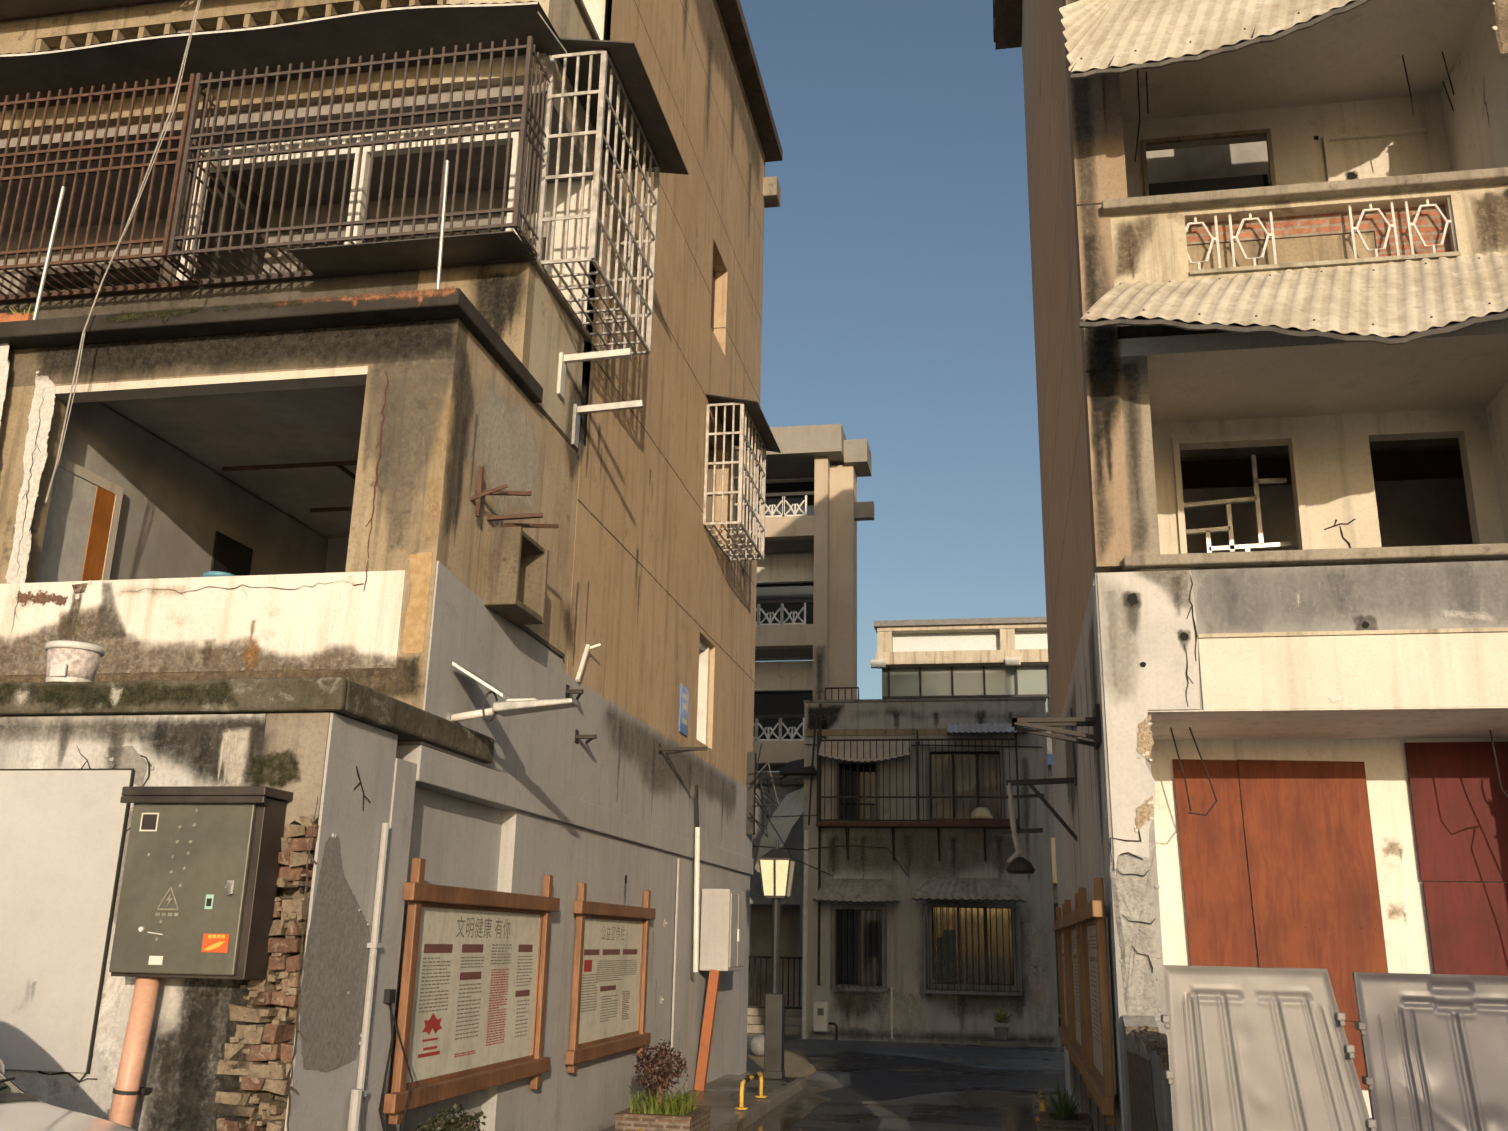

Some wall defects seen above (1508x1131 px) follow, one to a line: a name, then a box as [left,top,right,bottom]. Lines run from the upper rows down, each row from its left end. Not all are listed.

water stain [1087,237,1095,305]
water stain [1117,219,1151,276]
water stain [1474,193,1508,251]
crack [136,366,389,596]
water stain [0,584,417,786]
spalling [1136,714,1154,761]
crack [1184,575,1197,704]
flaking render [215,816,371,1131]
spalling [1110,796,1162,1022]
flaking render [1127,1050,1157,1131]